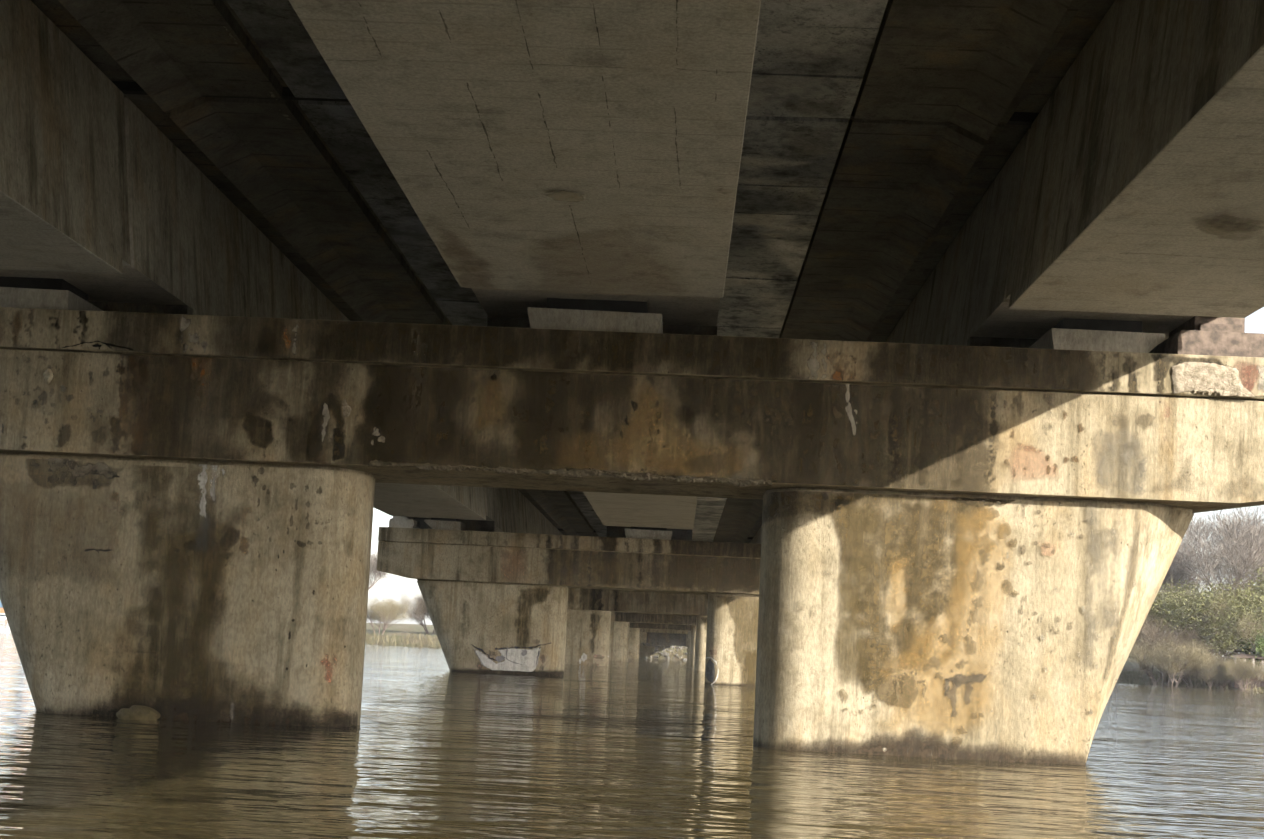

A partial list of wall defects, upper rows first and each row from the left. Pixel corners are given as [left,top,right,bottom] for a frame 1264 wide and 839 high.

crack [515,0,623,188]
leakage [1108,354,1139,393]
leakage [37,310,1095,765]
leakage [1108,533,1139,673]